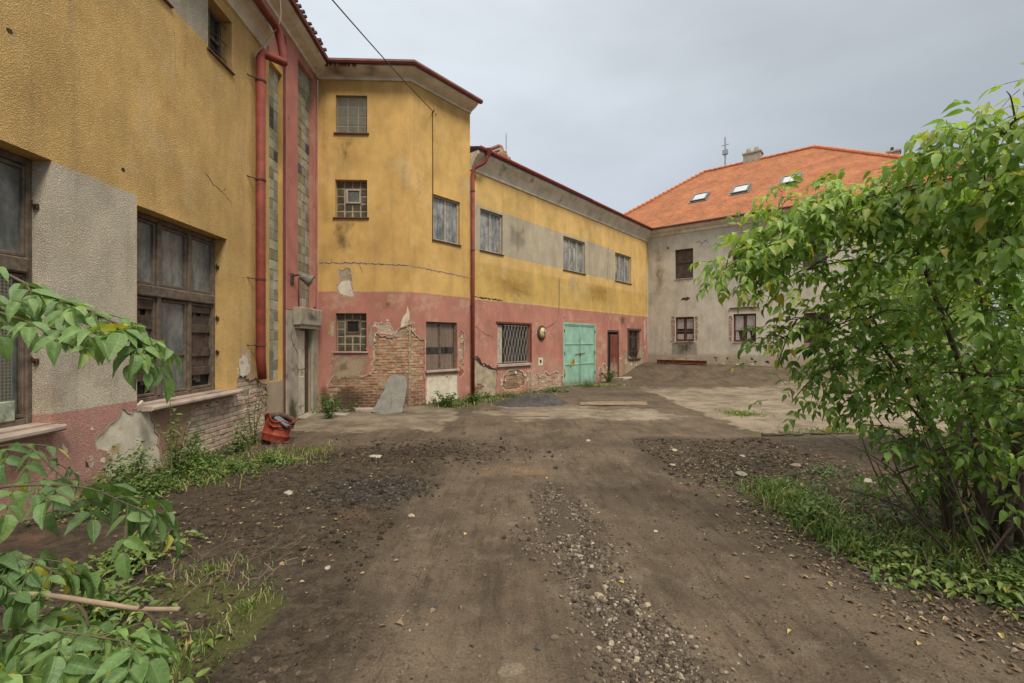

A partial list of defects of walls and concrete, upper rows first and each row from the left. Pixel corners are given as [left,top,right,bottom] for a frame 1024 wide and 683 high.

peeling [336,267,357,297]
crack [319,257,555,337]
spalling [182,353,269,460]
spalling [322,307,564,409]
peeling [16,400,167,523]